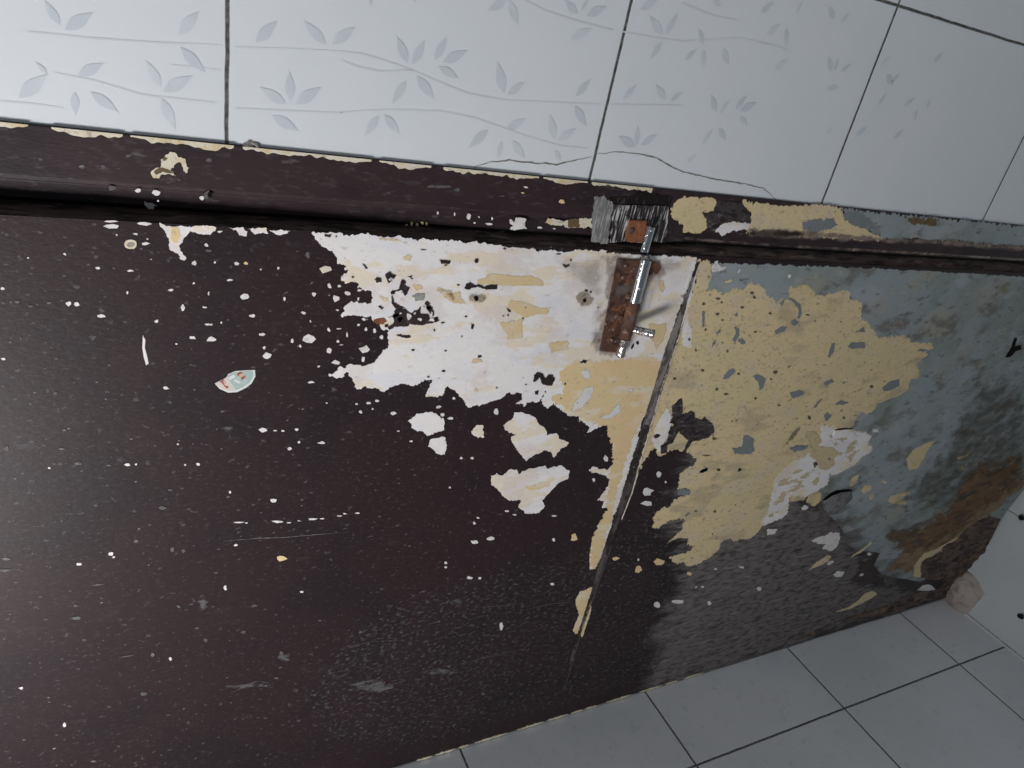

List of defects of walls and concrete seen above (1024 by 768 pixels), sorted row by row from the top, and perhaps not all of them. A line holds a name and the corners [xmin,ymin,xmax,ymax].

crack [473,151,776,200]
peeling [51,127,1024,761]
rust [887,456,1023,572]